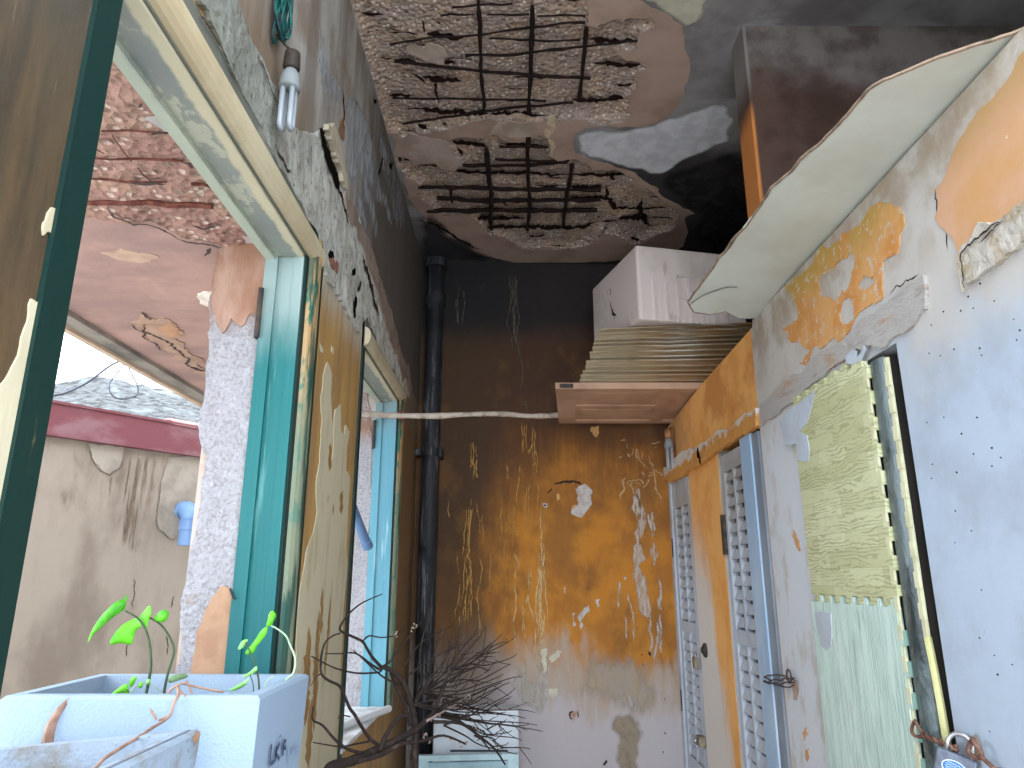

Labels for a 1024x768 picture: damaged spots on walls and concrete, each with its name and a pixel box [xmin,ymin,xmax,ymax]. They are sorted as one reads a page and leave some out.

flaking render [85,61,265,674]
flaking render [195,0,412,399]
spalling [351,0,695,263]
peeling [782,202,905,366]
peeling [935,51,1024,253]
leakage [124,462,147,538]
peeling [294,343,372,768]
leakage [454,424,549,710]
peeling [547,480,593,517]
peeling [617,488,663,660]
leakage [619,439,663,506]
leakage [586,661,653,768]